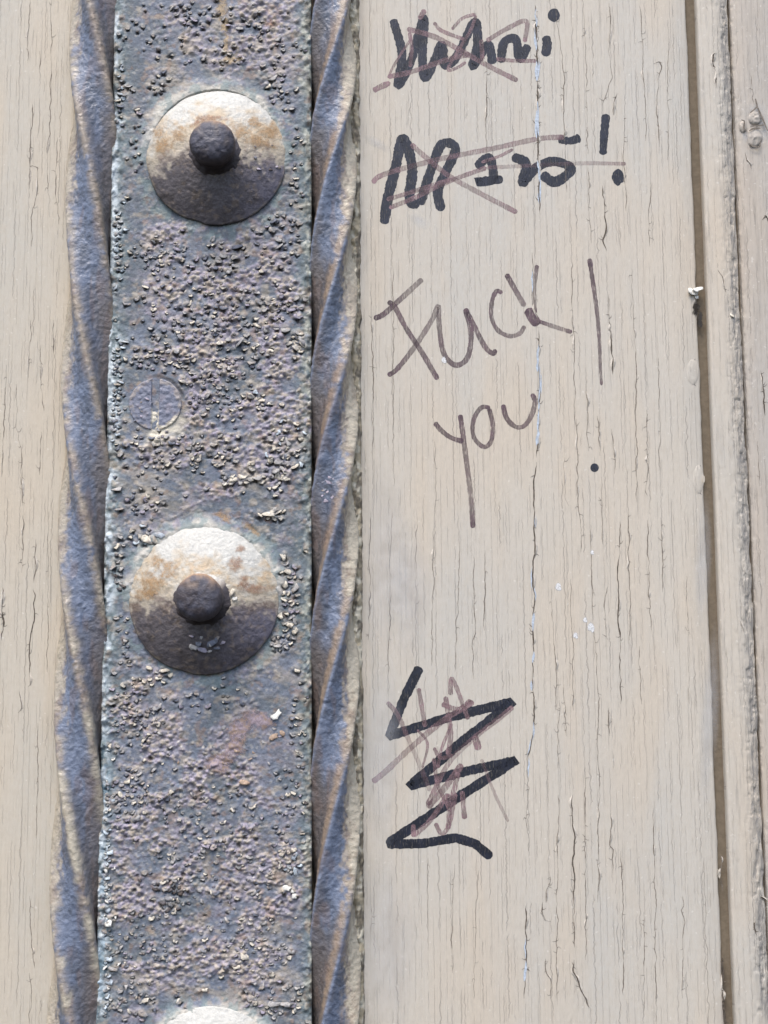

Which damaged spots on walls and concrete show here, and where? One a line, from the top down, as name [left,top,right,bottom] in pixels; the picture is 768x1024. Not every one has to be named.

crack [484,65,492,152]
crack [533,3,670,250]
crack [709,53,717,86]
crack [369,270,397,483]
rust [231,547,260,593]
crack [366,518,488,691]
crack [522,258,729,1024]
crack [427,864,478,996]